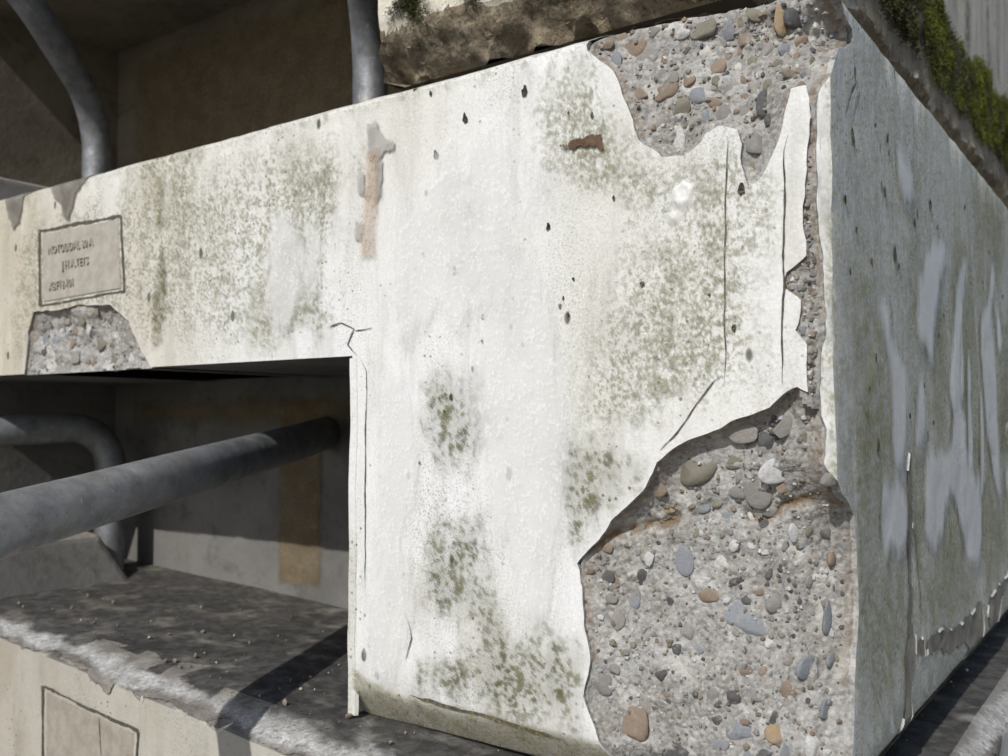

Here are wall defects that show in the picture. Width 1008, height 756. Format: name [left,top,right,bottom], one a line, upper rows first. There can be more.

rust [354,122,394,257]
rust [559,134,604,150]
spalling [25,304,156,375]
crack [660,146,728,450]
spalling [581,0,853,756]
peeling [897,452,1008,734]
peeling [981,722,1008,756]